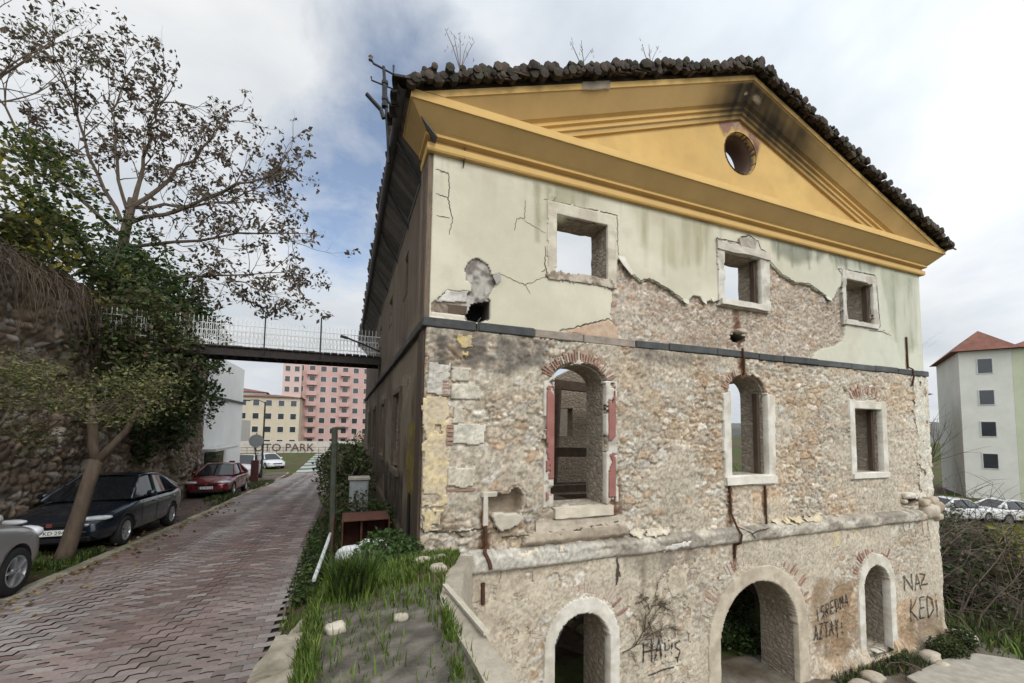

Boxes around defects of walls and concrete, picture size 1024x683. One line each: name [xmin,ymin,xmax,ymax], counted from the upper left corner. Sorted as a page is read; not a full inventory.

crack [436,169,453,234]
crack [502,197,619,293]
flaking render [431,259,501,321]
flaking render [545,256,844,358]
corrosion [479,511,490,549]
spalling [488,487,524,532]